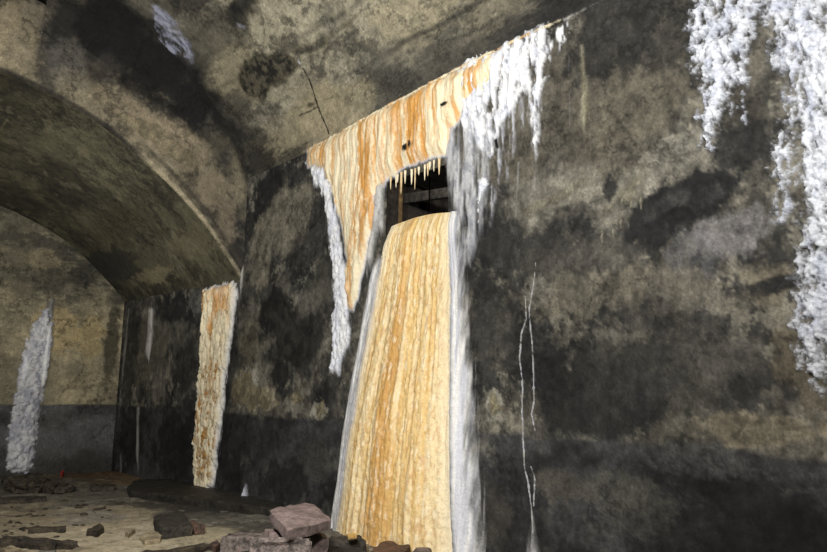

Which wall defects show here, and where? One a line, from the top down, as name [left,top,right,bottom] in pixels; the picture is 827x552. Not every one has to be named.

efflorescence [153,6,193,59]
crack [299,68,329,134]
water stain [686,0,827,393]
crack [519,298,535,552]